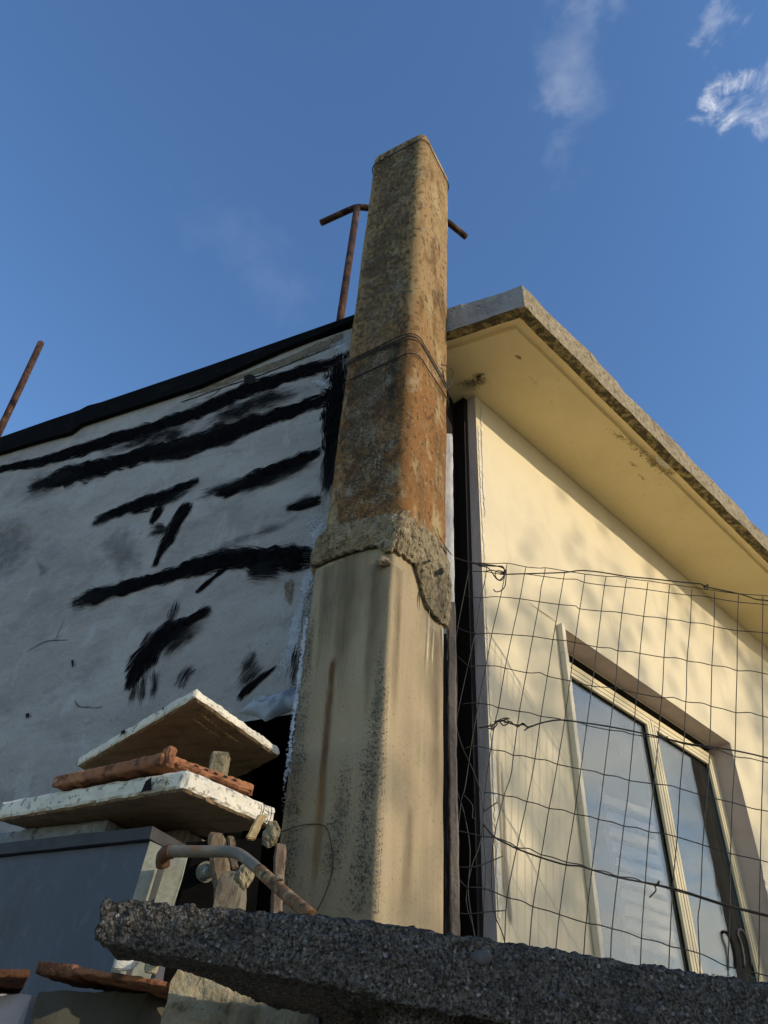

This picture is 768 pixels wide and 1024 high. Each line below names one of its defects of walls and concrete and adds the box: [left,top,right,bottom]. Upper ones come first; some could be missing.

rust [320,661,334,788]